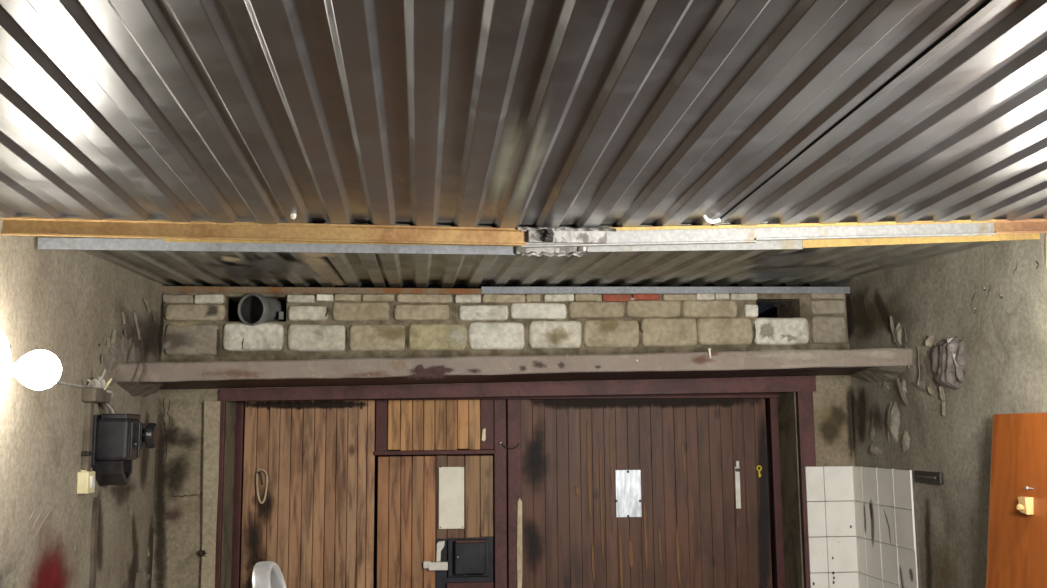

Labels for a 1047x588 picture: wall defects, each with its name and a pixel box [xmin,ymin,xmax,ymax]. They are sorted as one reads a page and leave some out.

peeling [99,298,156,386]
peeling [890,316,966,415]
damp [823,389,882,455]
damp [112,413,196,588]